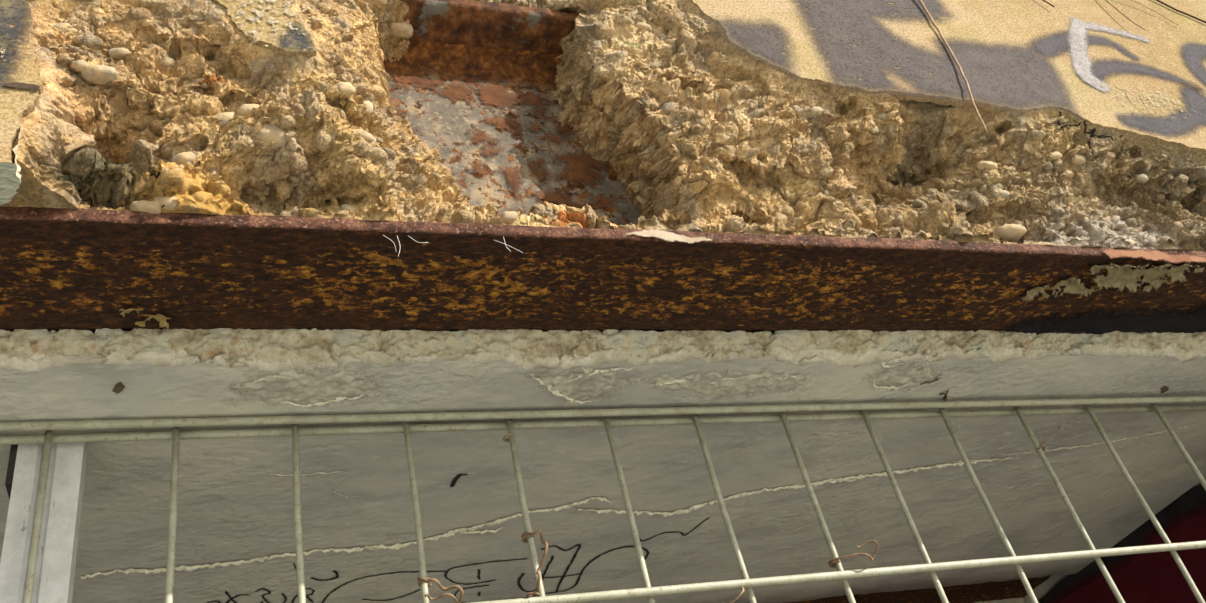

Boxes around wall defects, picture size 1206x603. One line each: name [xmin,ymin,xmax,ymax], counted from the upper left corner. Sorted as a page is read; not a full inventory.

corrosion [392,72,618,228]
spalling [1,0,1206,302]
corrosion [119,308,171,329]
corrosion [1102,248,1206,263]
crack [80,421,1206,579]